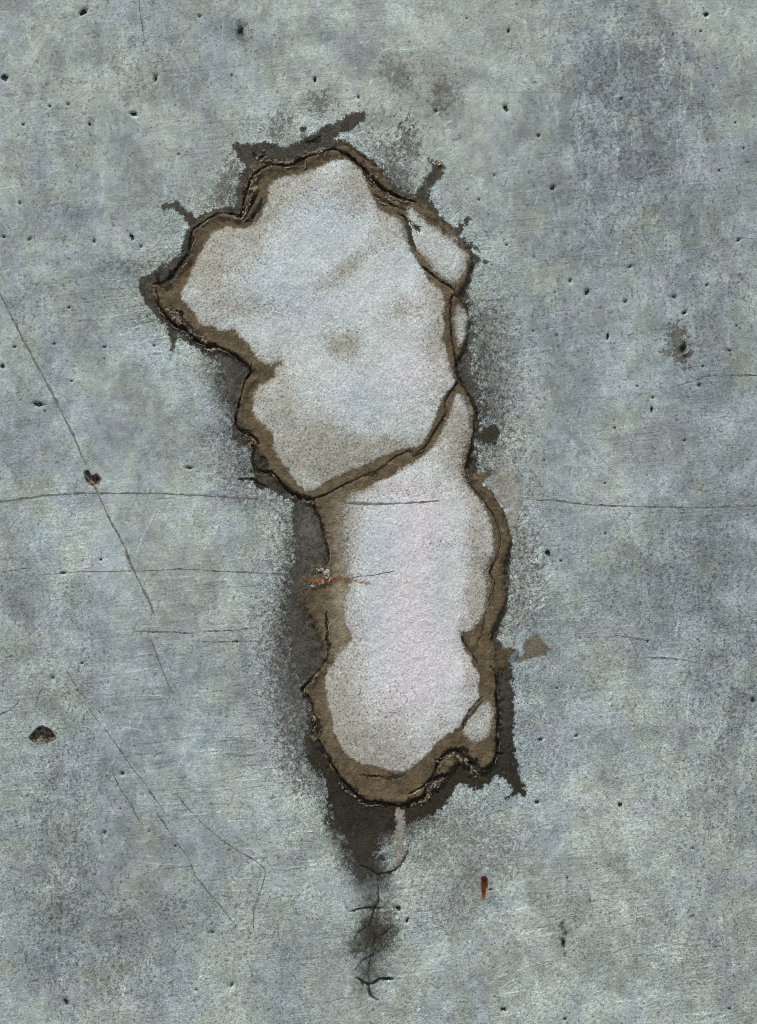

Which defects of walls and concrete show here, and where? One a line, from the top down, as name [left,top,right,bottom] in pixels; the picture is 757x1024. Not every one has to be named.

spalling [236,146,328,215]
spalling [163,304,216,353]
crack [0,135,505,999]
spalling [305,564,335,589]
rust [302,576,370,592]
leakage [138,111,551,986]
spalling [410,751,480,808]